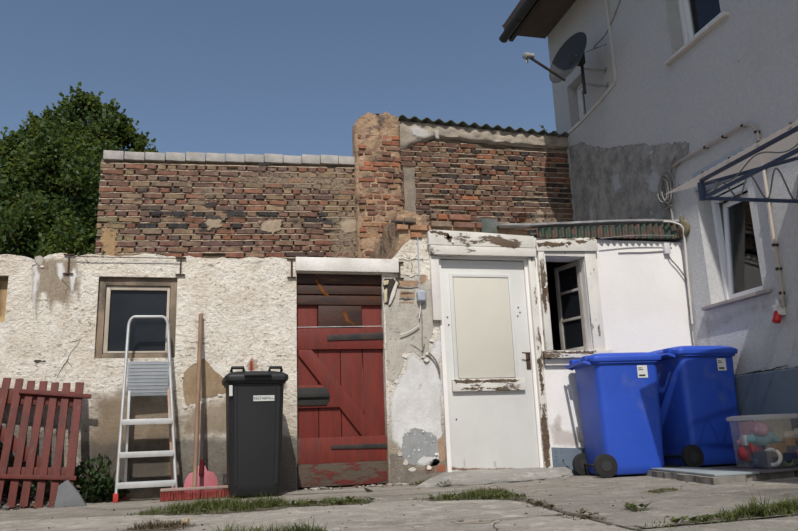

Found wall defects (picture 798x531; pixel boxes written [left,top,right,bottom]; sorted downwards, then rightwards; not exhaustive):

damp [32,259,78,314]
flaking render [383,273,441,384]
flaking render [181,358,226,433]
peeling [454,379,518,390]
spalling [390,428,448,484]
peeling [540,414,551,468]